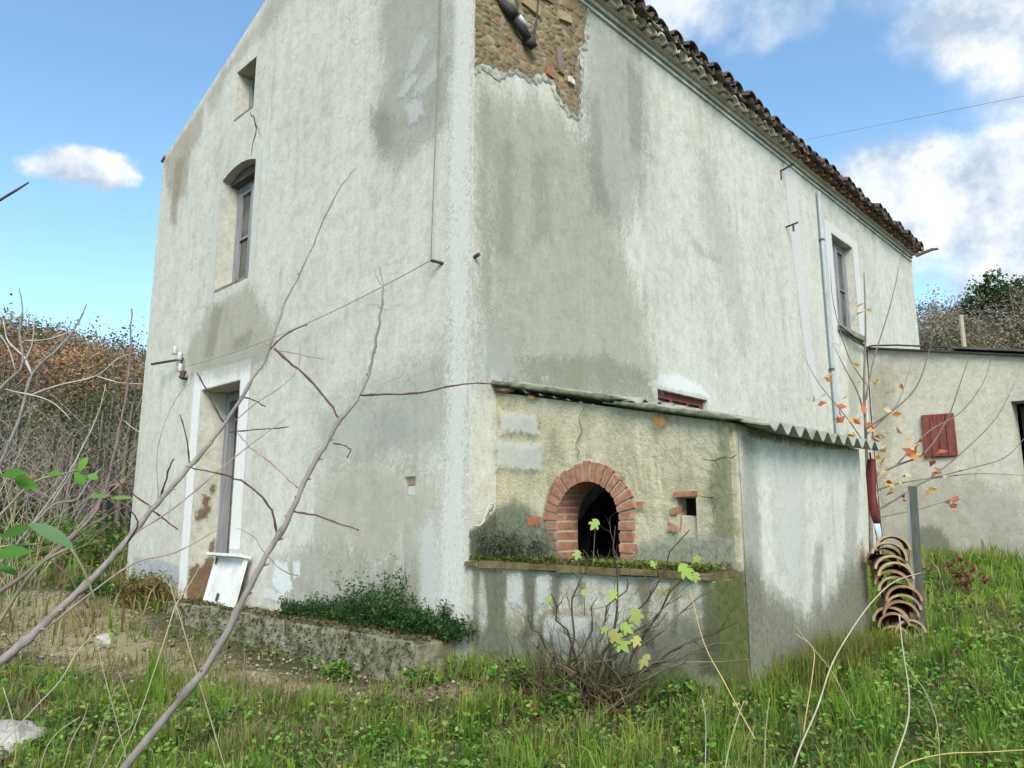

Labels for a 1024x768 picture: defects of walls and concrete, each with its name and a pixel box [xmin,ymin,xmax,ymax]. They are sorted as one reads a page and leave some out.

leakage [398,34,442,124]
flaking render [474,0,590,121]
leakage [473,308,530,385]
flaking render [195,484,216,522]
leakage [473,570,600,657]
leakage [636,579,654,647]
leakage [746,550,870,681]